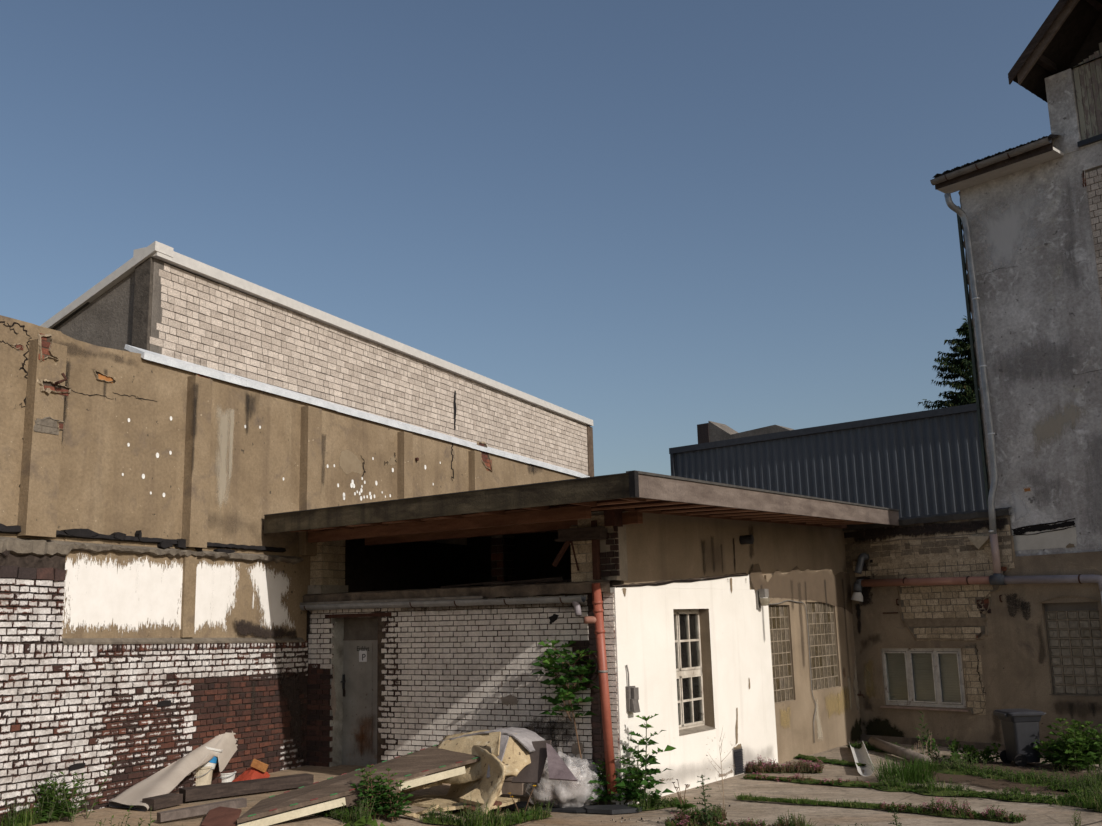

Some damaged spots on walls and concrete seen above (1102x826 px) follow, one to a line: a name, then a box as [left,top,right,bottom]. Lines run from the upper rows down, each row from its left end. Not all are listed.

crack [0,321,32,408]
spalling [38,379,72,396]
spalling [92,369,116,383]
crack [71,390,157,402]
water stain [218,410,234,502]
crack [449,390,457,481]
peeling [62,553,183,633]
peeling [194,560,292,633]
spalling [850,524,1077,715]